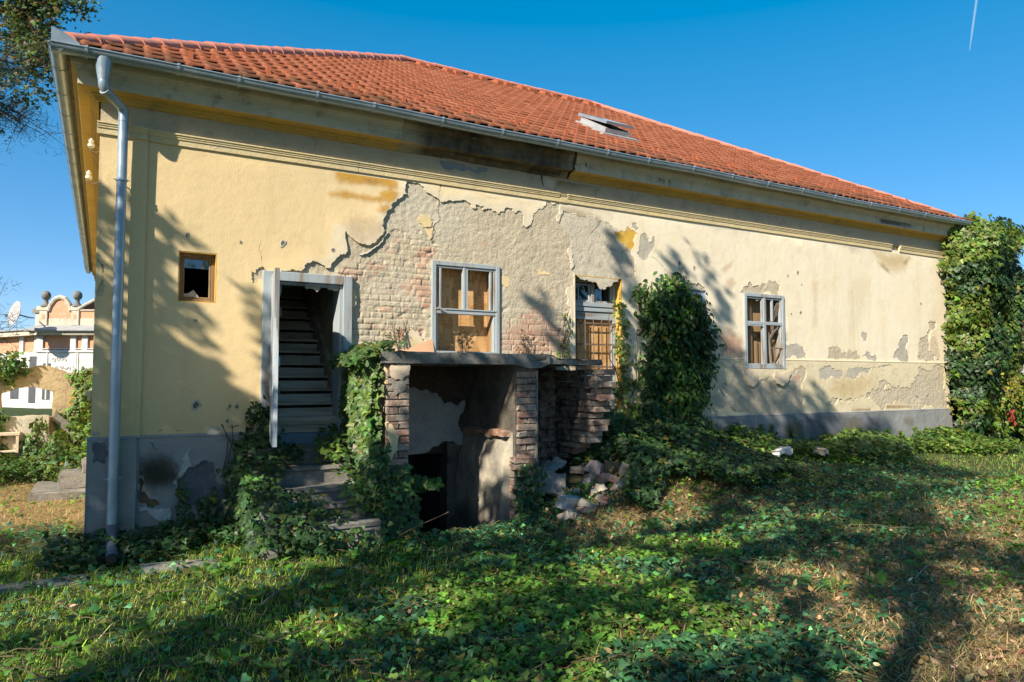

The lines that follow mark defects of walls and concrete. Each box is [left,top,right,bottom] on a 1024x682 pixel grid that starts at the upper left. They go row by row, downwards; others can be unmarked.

crack [541,154,600,185]
spalling [251,267,265,283]
spalling [282,182,655,382]
spalling [741,271,802,302]
spalling [819,321,948,410]
damp [141,460,176,485]
spalling [137,477,160,508]
spalling [177,460,230,517]